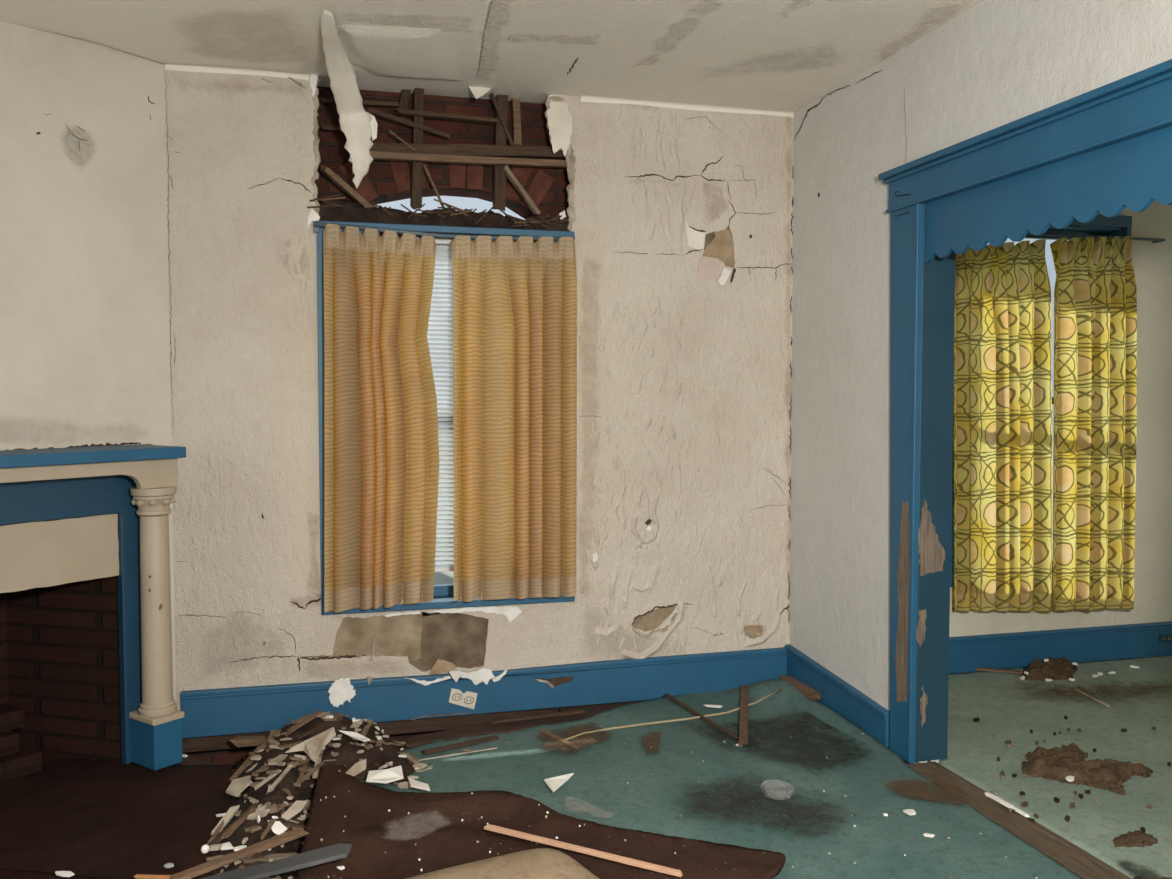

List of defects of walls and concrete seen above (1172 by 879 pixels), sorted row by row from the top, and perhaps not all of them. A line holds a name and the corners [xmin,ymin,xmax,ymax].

crack [474,0,493,78]
peeling [307,10,378,227]
spalling [469,87,491,99]
spalling [545,93,576,230]
spalling [684,218,736,286]
crack [615,70,881,622]
crack [178,598,321,671]
flaking render [298,606,522,686]
peeling [894,499,945,729]